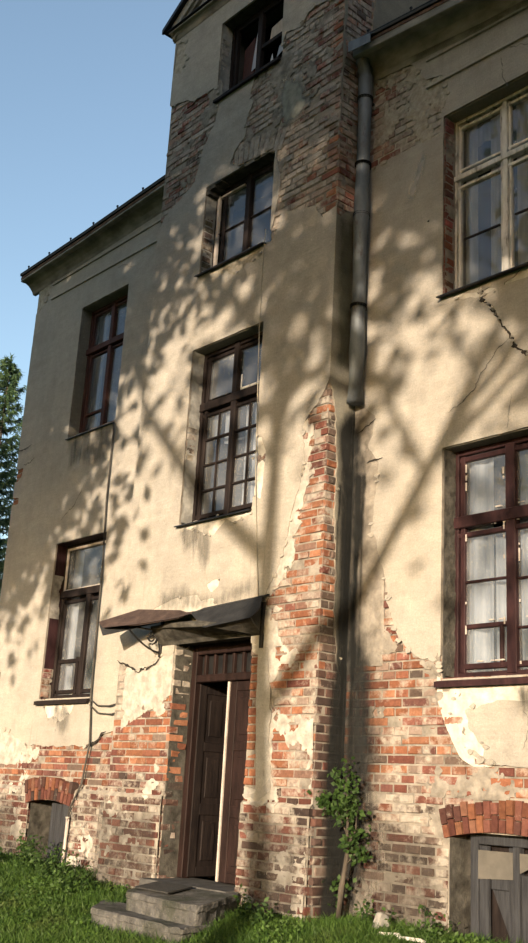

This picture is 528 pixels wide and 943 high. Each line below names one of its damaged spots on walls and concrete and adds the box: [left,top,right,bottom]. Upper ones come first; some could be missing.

flaking render [161,39,230,225]
flaking render [200,214,262,275]
flaking render [231,0,375,240]
flaking render [370,66,528,304]
crack [448,286,528,413]
flaking render [0,645,192,889]
flaking render [234,383,342,922]
damp [319,411,375,920]
flaking render [343,406,528,933]